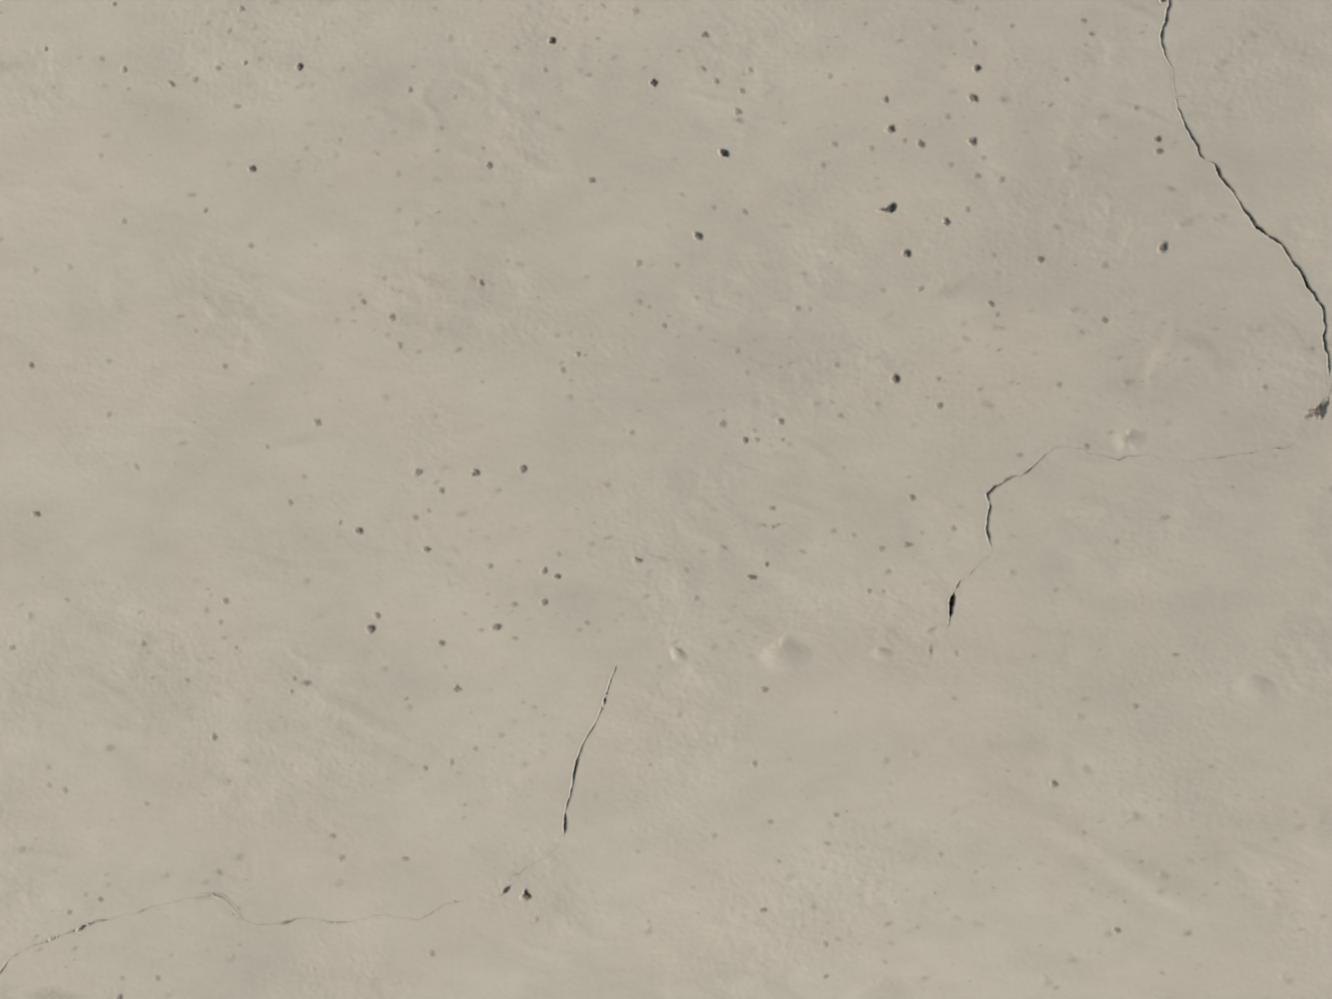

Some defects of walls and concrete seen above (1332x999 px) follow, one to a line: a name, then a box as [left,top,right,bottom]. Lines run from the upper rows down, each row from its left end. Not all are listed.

crack [1157,0,1332,397]
crack [943,444,1162,631]
crack [498,665,618,898]
crack [0,891,461,976]